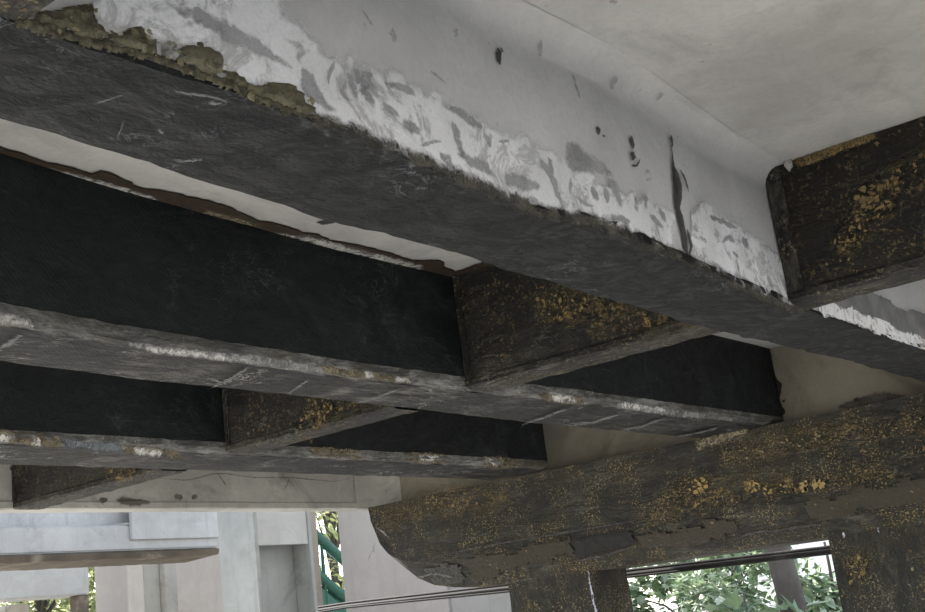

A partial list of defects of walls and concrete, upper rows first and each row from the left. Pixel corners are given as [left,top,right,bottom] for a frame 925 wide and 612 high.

peeling [0,0,805,317]
peeling [0,313,34,327]
peeling [819,292,925,349]
peeling [128,342,410,399]
leakage [839,393,902,409]